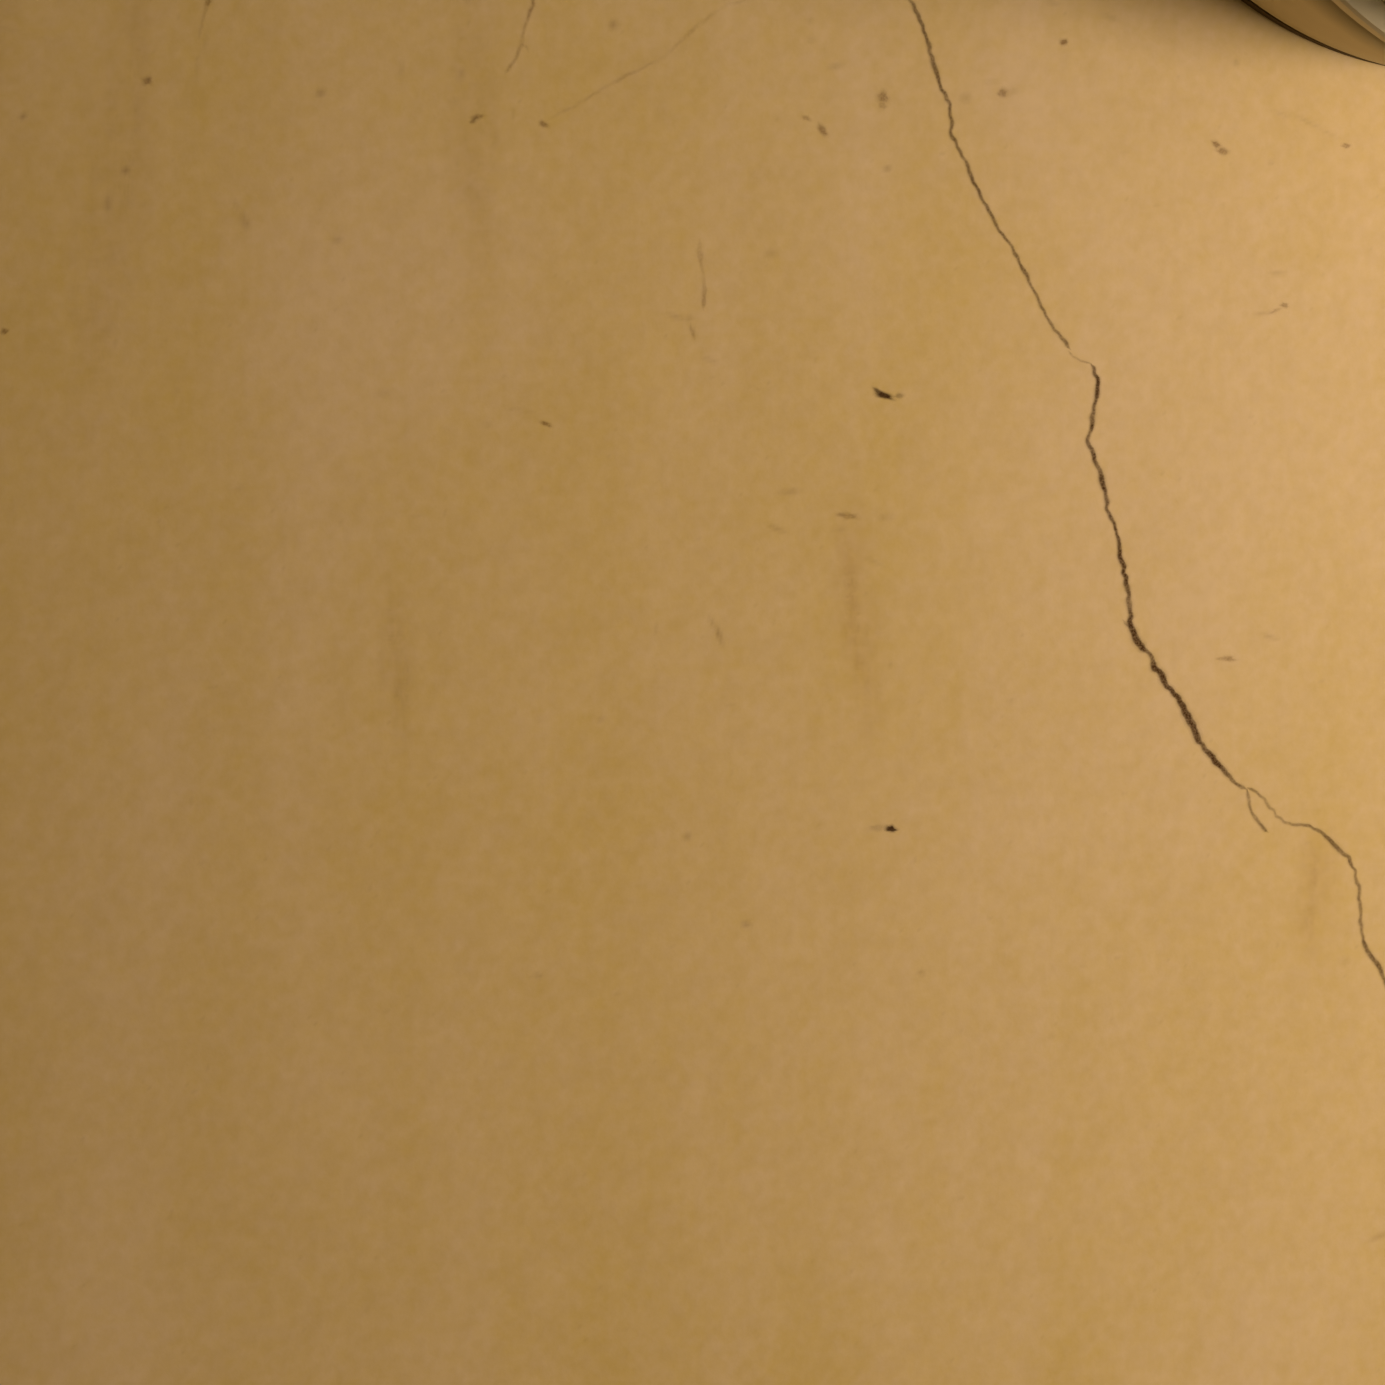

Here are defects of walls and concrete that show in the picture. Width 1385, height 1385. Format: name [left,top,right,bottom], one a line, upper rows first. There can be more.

crack [1087,367,1240,786]